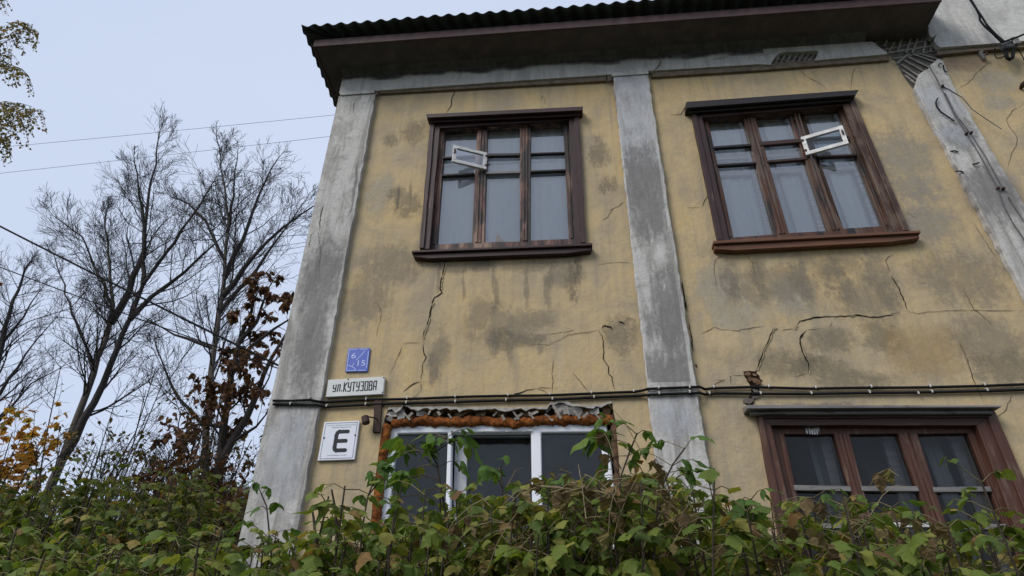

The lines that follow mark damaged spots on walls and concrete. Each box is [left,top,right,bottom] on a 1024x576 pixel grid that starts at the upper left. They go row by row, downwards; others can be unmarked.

crack [390,263,446,397]
crack [506,318,633,398]
crack [682,256,1014,377]